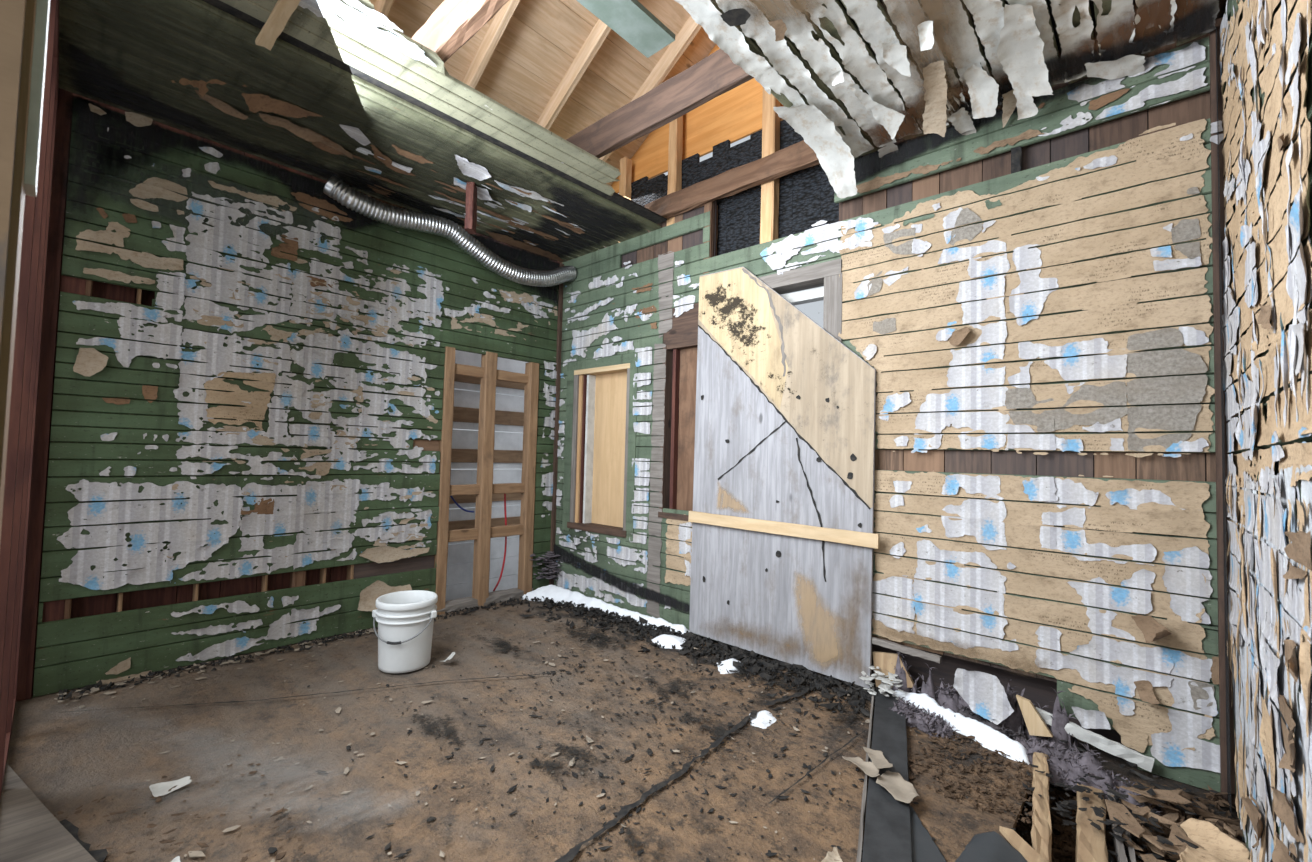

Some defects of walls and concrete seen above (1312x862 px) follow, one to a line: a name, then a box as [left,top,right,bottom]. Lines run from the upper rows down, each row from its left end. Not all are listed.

peeling [171,78,585,262]
peeling [76,192,699,618]
peeling [674,0,1312,862]
peeling [54,619,378,708]
peeling [171,596,299,636]